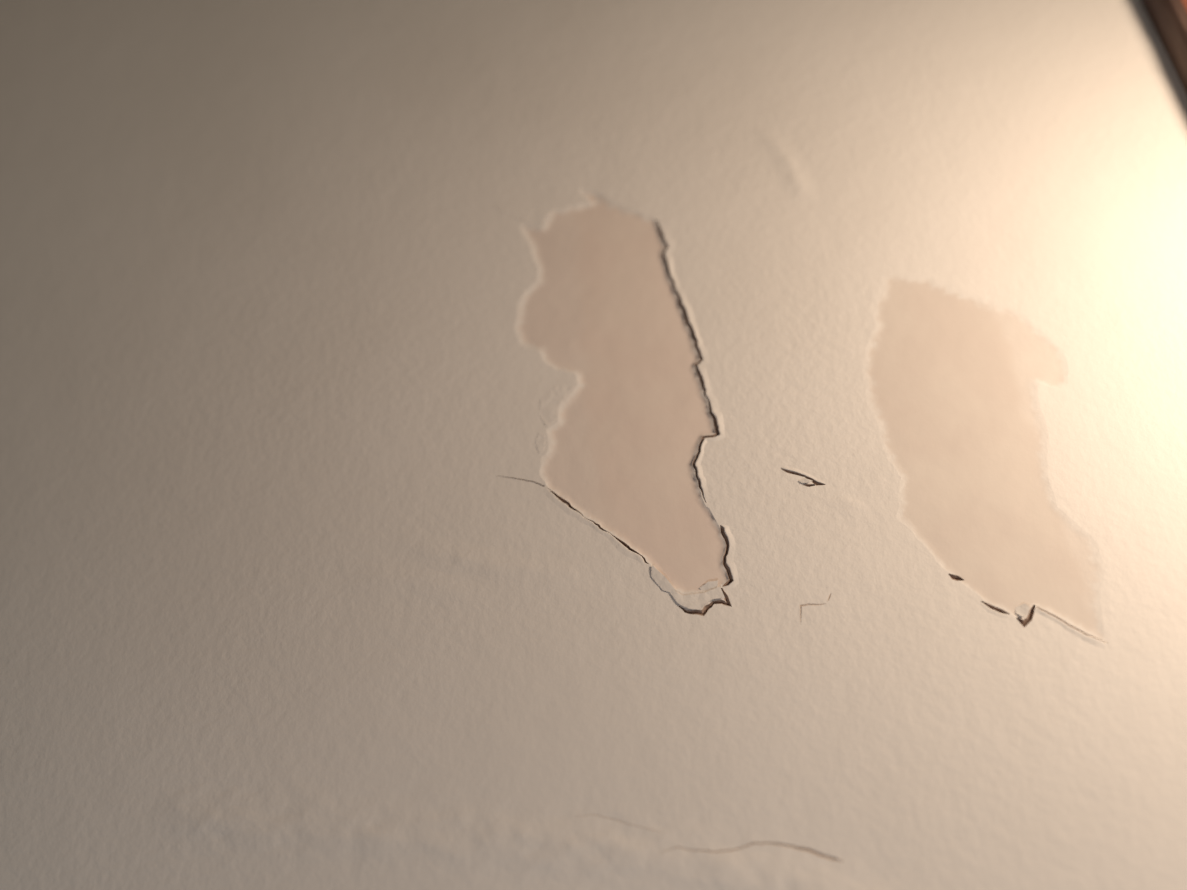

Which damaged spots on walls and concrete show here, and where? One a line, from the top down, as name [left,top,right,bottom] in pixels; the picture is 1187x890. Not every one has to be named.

peeling [495,186,739,616]
peeling [862,274,1107,649]